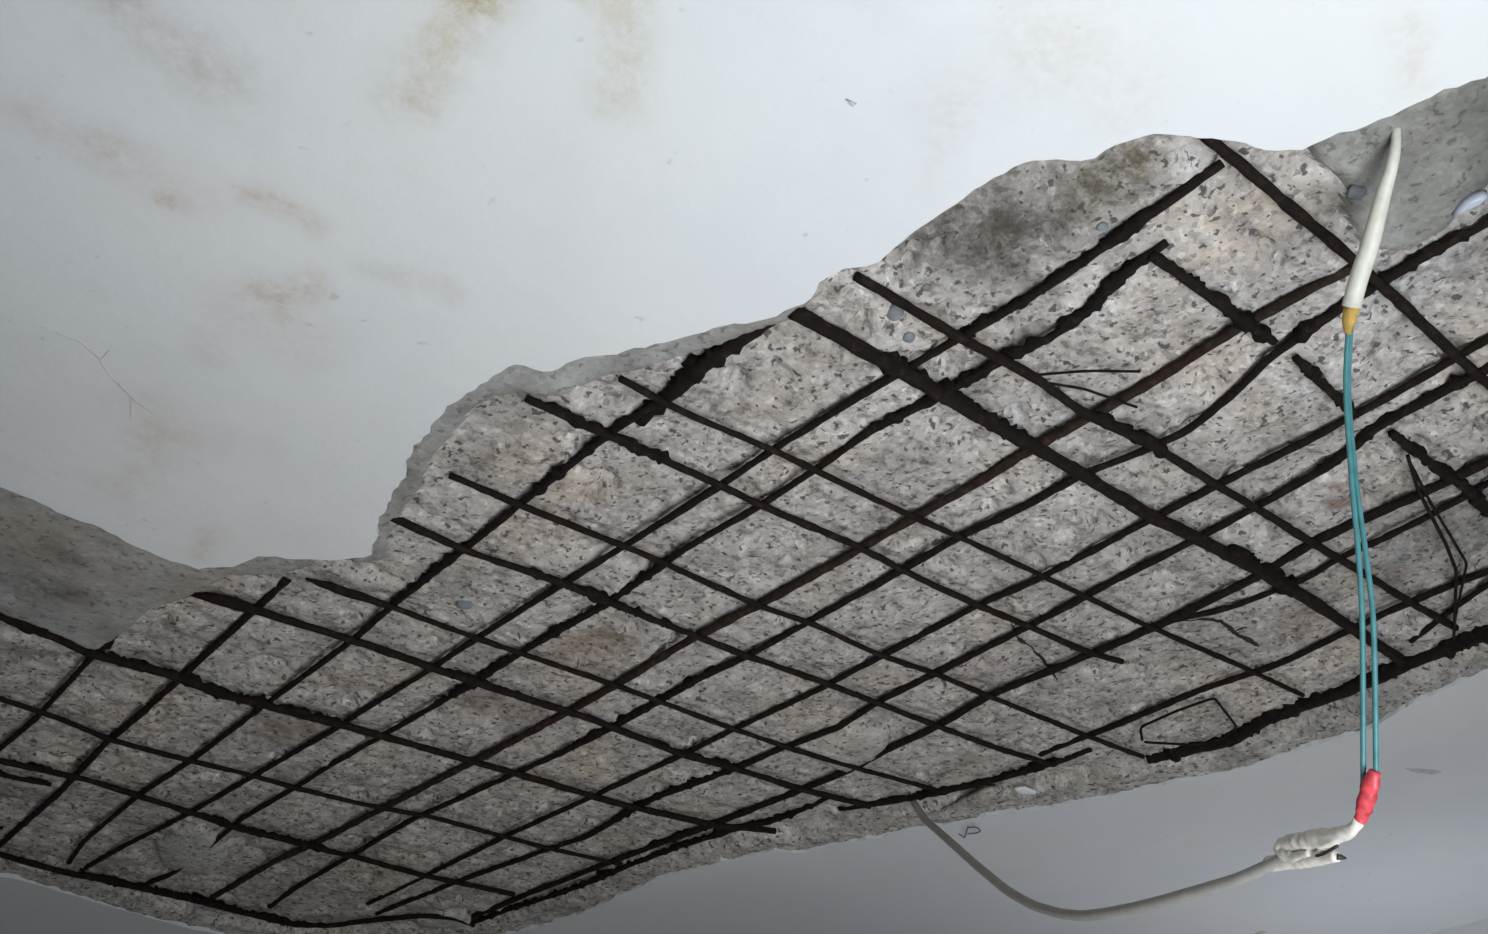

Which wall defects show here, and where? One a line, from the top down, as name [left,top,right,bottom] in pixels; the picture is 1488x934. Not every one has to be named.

spalling [0,401,1360,934]
spalling [0,77,1488,809]